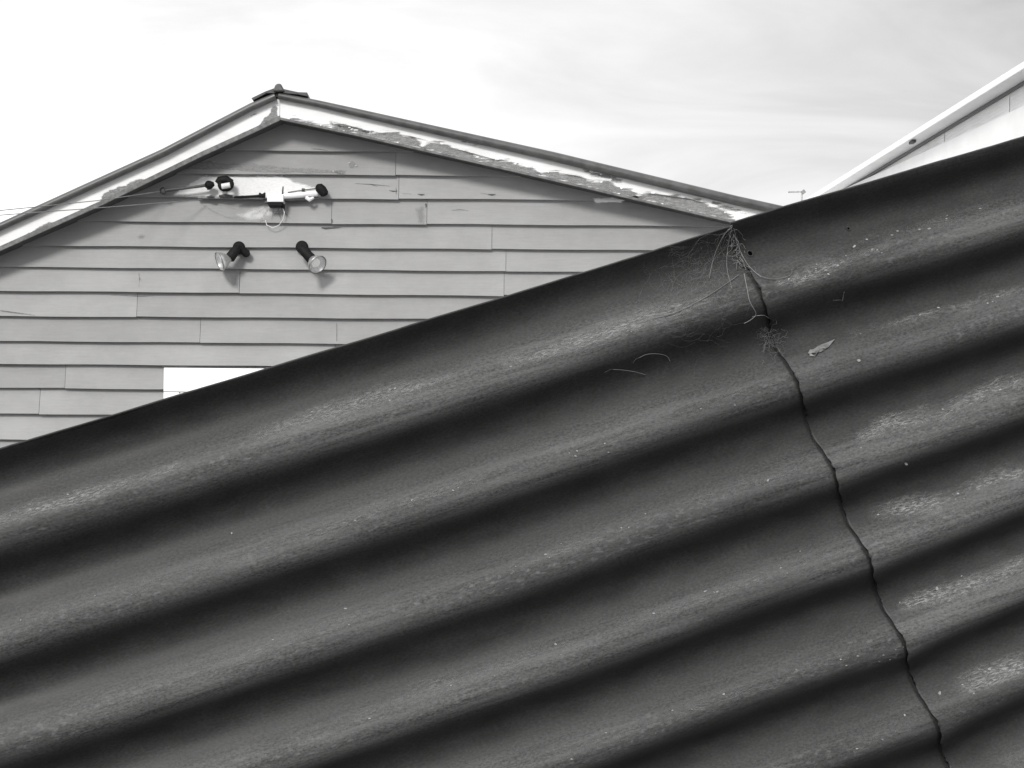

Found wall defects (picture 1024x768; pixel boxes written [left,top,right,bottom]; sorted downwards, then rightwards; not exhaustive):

peeling [251,104,746,221]